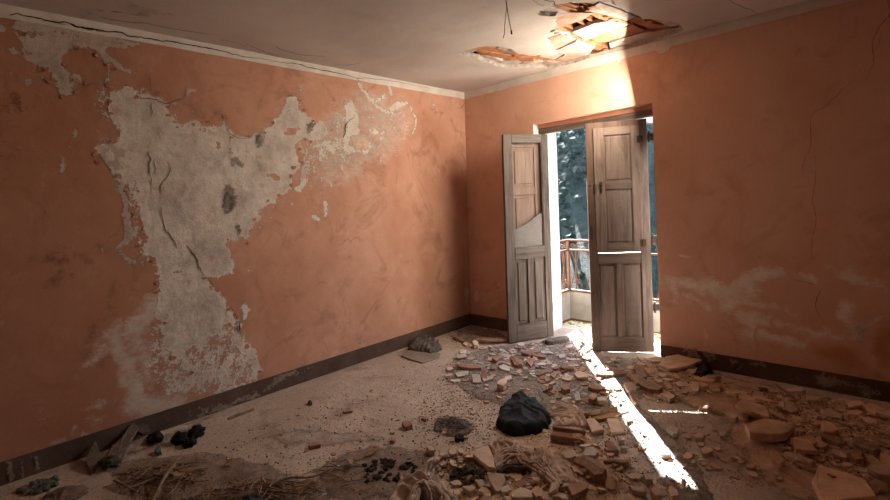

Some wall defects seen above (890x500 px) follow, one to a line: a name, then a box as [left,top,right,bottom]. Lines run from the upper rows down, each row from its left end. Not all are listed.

crack [10,9,427,88]
spalling [460,0,683,68]
crack [148,153,217,291]
peeling [0,20,436,418]
leakage [658,260,890,379]